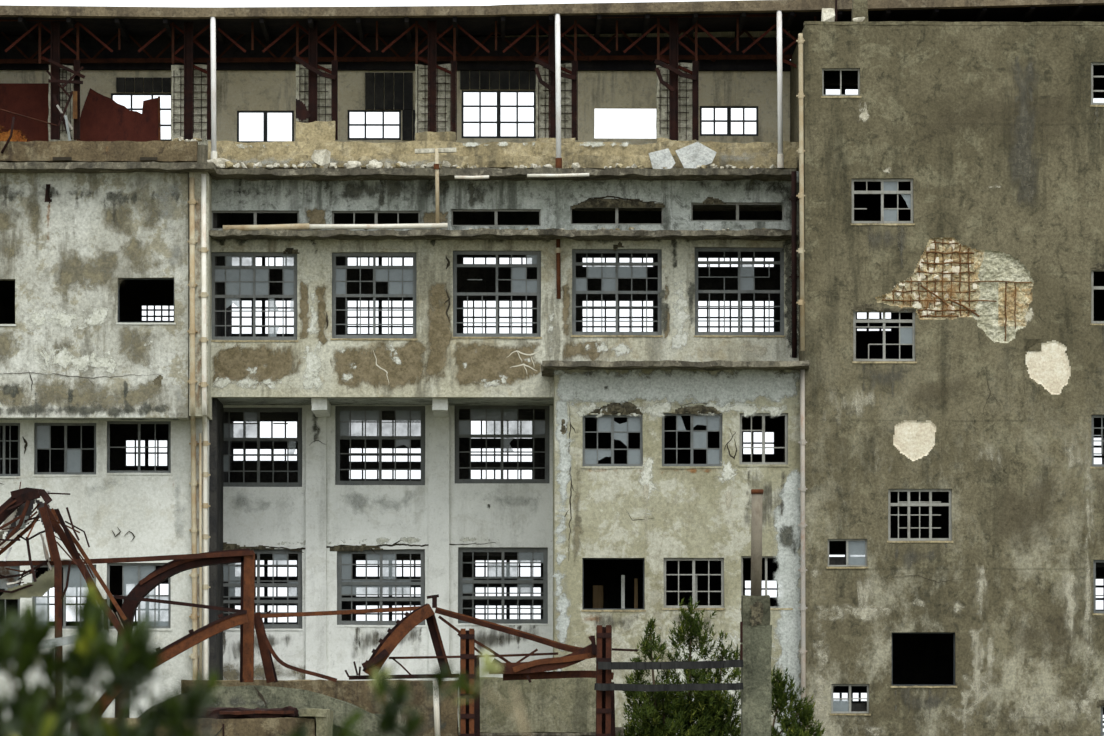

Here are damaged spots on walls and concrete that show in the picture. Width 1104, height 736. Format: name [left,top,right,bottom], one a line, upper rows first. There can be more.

corrosion [0,127,27,142]
leakage [104,192,137,219]
spalling [876,238,1034,343]
peeling [212,281,541,391]
peeling [548,284,630,361]
crack [4,372,159,392]
leakage [0,381,166,418]
crack [508,349,543,372]
peeling [1026,340,1071,394]
peeling [893,420,936,461]
leakage [819,585,888,621]
leakage [953,631,994,722]